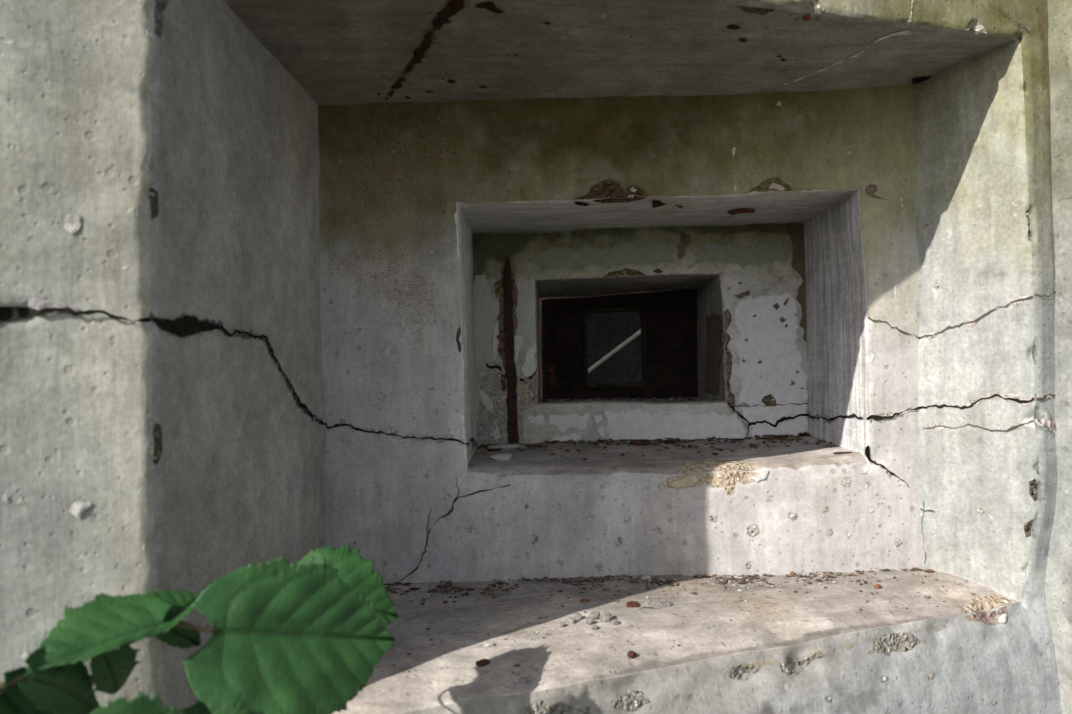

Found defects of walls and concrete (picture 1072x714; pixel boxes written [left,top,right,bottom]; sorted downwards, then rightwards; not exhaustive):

corrosion [377,0,504,100]
spalling [575,179,649,206]
spalling [743,177,794,194]
peeling [531,239,677,278]
crack [867,291,1056,339]
crack [0,306,478,448]
peeling [477,259,808,461]
spalling [658,459,769,495]
crack [728,390,1055,563]
crack [397,477,510,583]
spalling [961,594,1011,625]
spalling [866,633,924,655]